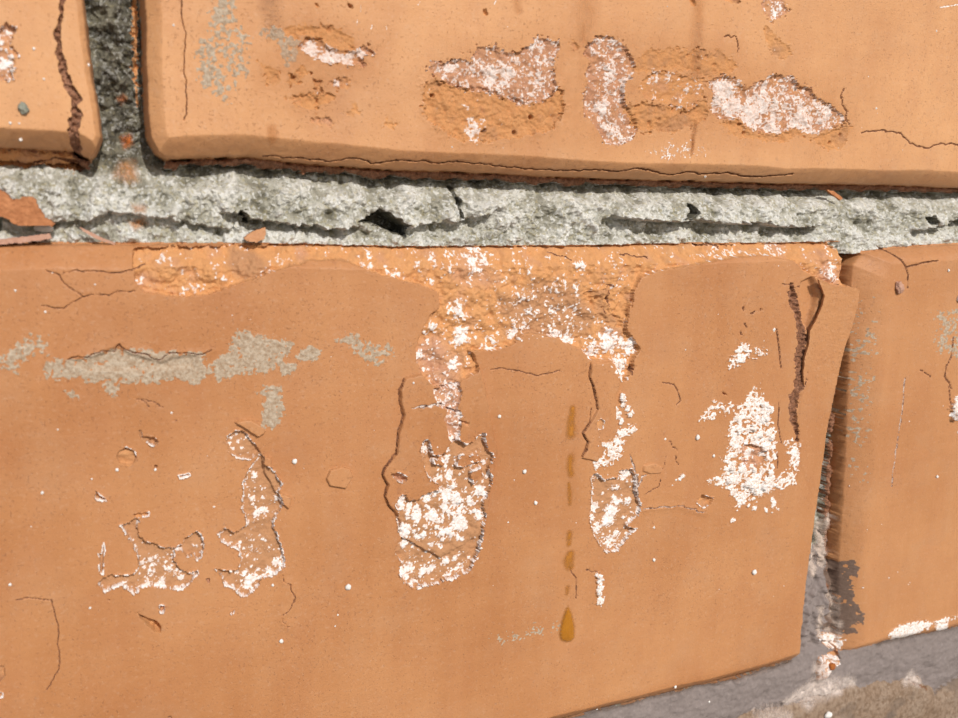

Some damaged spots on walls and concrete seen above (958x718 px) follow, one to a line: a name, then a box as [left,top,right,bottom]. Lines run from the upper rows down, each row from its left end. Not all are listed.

crack [33,0,87,172]
crack [180,0,188,119]
spalling [419,34,853,152]
spalling [761,0,792,60]
crack [41,264,145,309]
spalling [97,419,291,602]
crack [381,378,444,512]
spalling [132,227,860,590]
rust [565,532,573,569]
efflorescence [699,382,801,523]
crack [776,282,808,468]
crack [16,597,61,690]